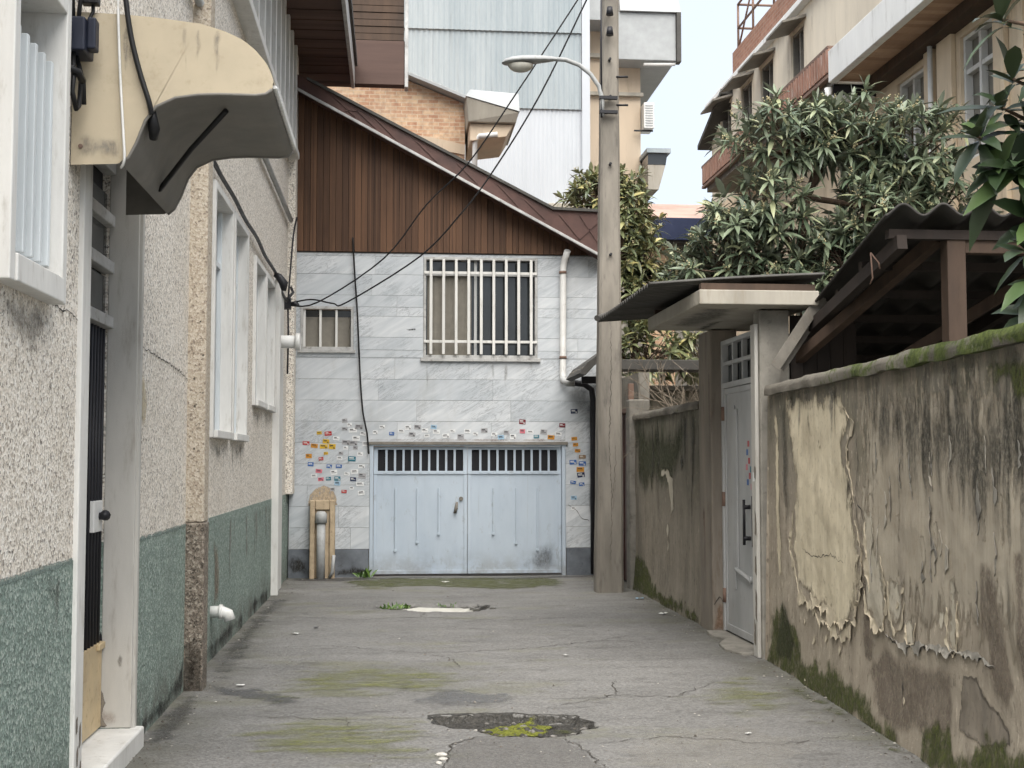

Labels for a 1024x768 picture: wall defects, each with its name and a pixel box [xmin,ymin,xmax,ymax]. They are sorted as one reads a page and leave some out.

leakage [636,417,694,508]
peeling [661,457,683,550]
peeling [774,345,1024,678]
leakage [879,369,1024,504]